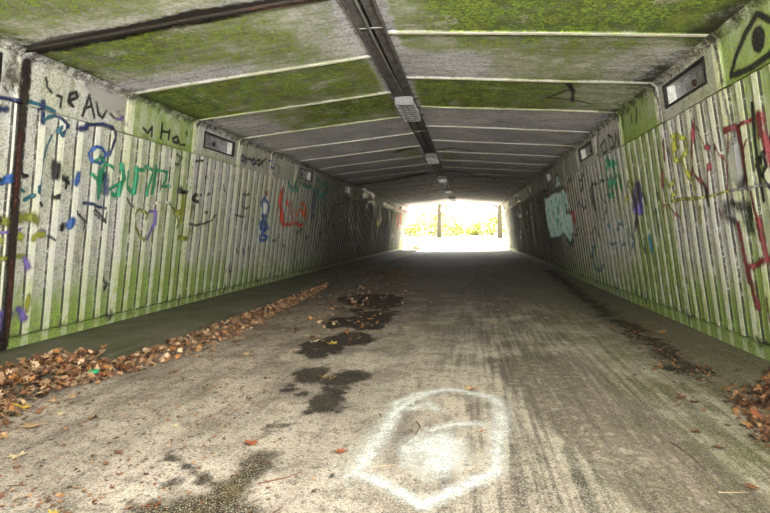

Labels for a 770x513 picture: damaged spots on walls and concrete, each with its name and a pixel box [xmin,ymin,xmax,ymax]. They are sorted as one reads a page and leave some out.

leakage [4,0,325,93]
leakage [706,37,736,145]
corrosion [0,58,32,351]
leakage [127,450,279,513]